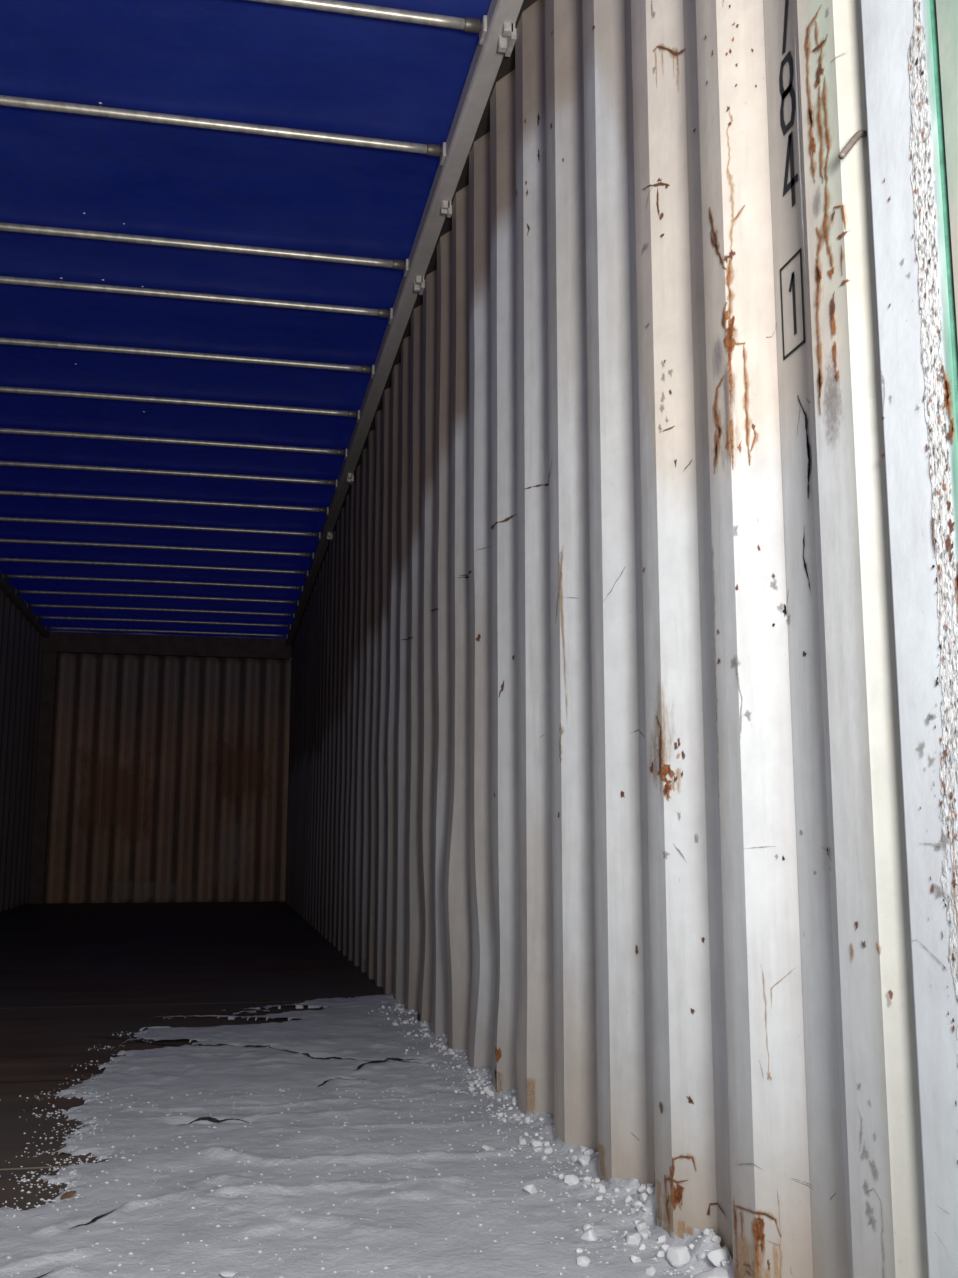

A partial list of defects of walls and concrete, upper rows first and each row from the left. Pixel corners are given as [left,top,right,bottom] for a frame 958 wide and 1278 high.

corrosion [653,44,685,83]
corrosion [805,4,848,430]
peeling [901,0,958,1001]
corrosion [650,713,685,800]
corrosion [654,1155,696,1238]
corrosion [733,1190,782,1278]